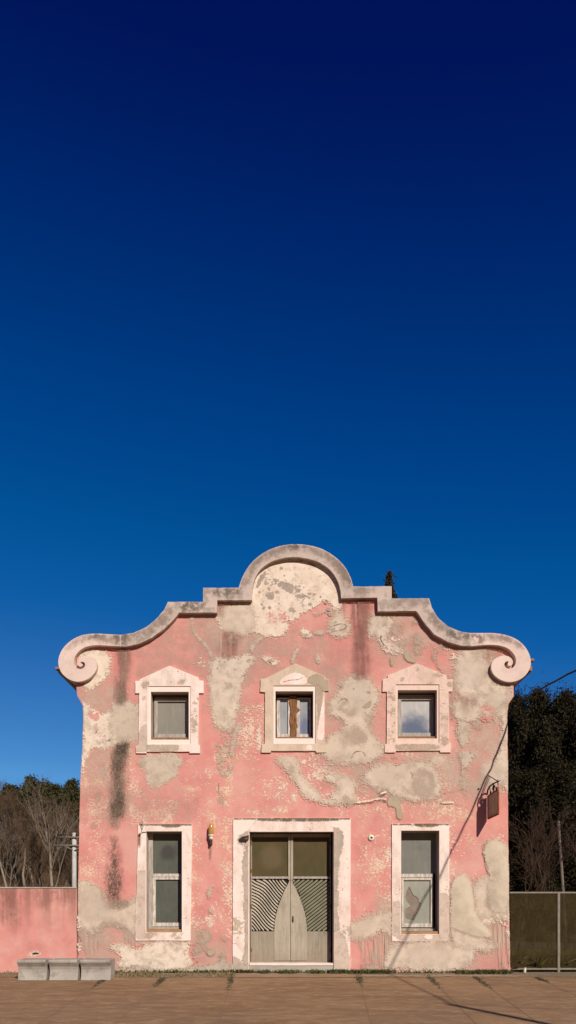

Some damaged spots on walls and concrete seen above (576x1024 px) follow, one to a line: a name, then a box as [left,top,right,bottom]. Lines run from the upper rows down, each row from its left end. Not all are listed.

water stain [214,545,369,674]
spalling [256,560,337,631]
water stain [110,743,128,824]
peeling [78,608,510,971]
water stain [107,839,124,908]